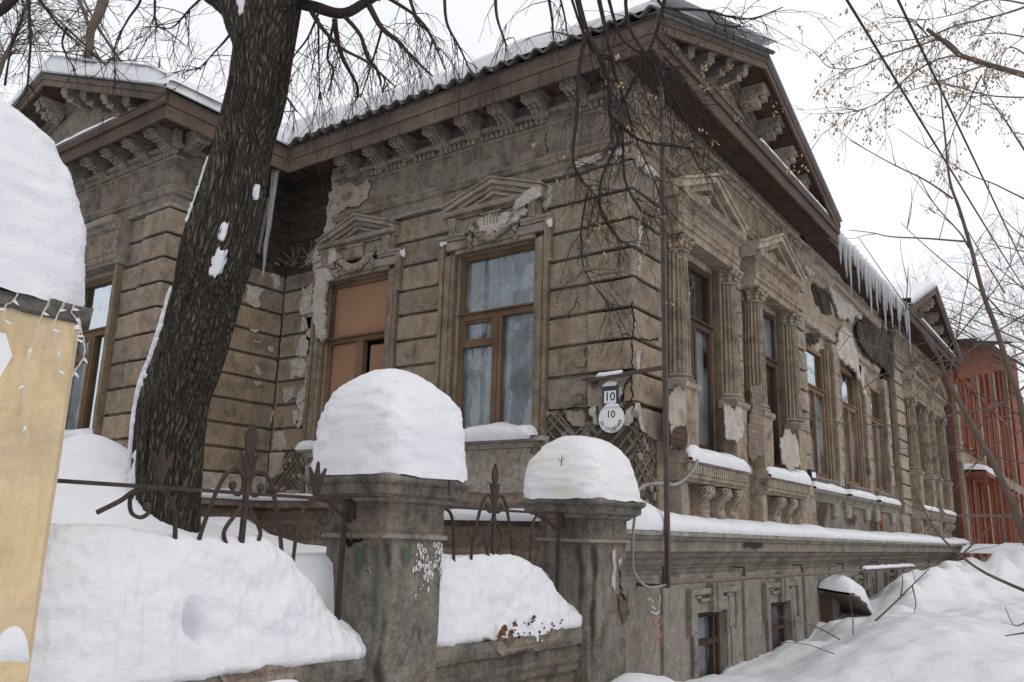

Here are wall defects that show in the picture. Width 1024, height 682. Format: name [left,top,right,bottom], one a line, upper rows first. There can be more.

flaking render [326,179,371,218]
flaking render [476,183,554,233]
peeling [635,194,644,273]
peeling [266,244,338,493]
crack [622,301,659,400]
flaking render [803,244,897,483]
flaking render [545,347,688,507]
flaking render [724,383,765,462]
flaking render [780,429,801,472]